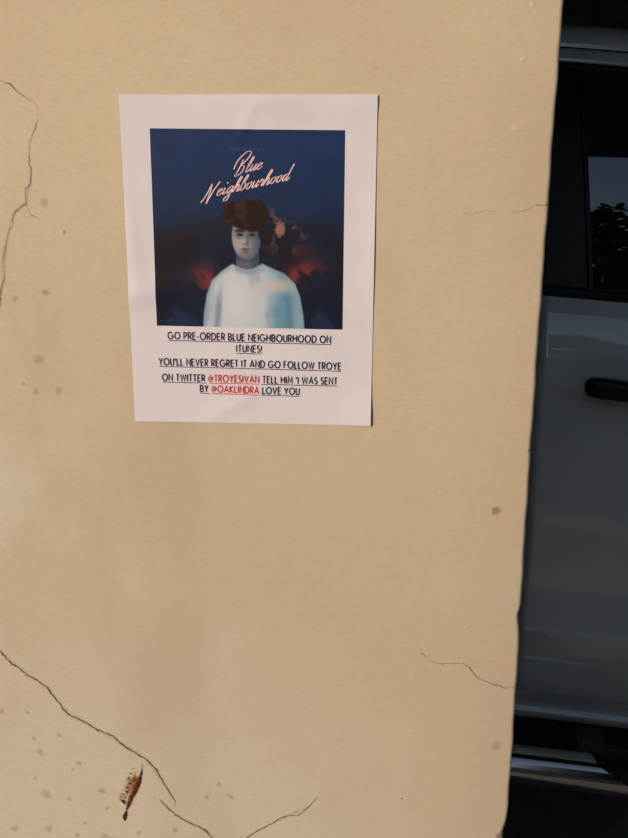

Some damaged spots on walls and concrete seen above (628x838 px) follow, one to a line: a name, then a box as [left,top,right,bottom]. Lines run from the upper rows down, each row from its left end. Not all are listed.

crack [0,120,38,300]
crack [0,651,212,838]
corrosion [121,768,142,821]
crack [247,797,317,838]